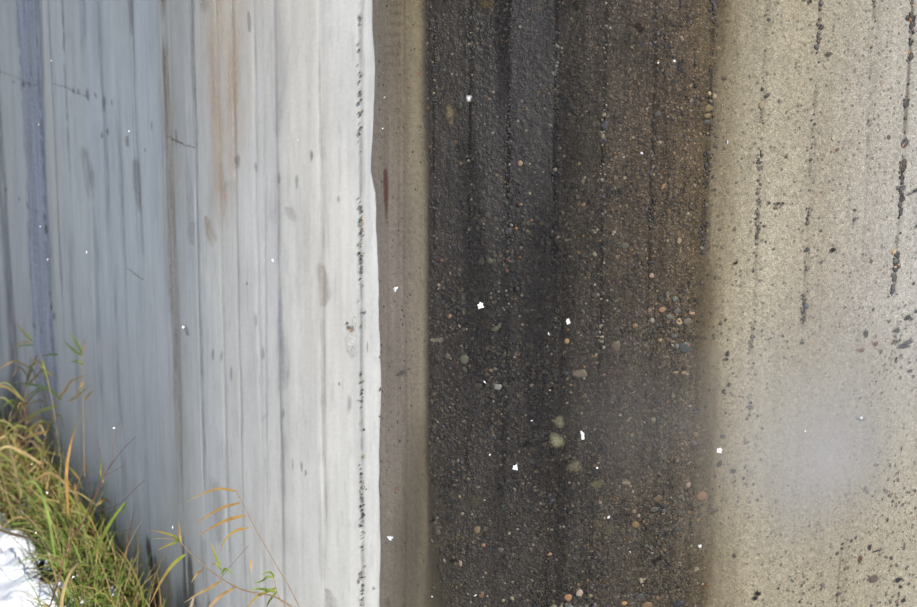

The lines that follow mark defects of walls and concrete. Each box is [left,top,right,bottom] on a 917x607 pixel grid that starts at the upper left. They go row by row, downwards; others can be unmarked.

water stain [371,0,725,607]